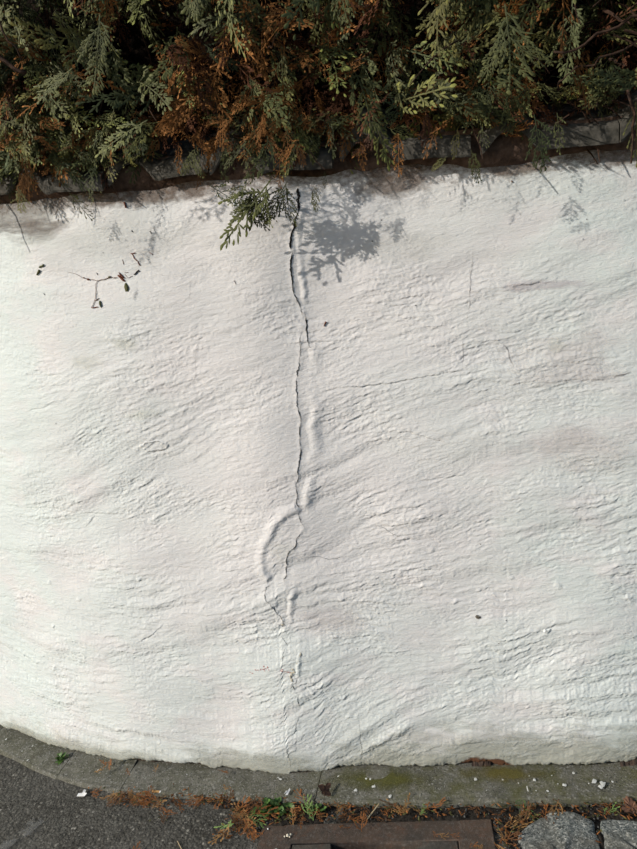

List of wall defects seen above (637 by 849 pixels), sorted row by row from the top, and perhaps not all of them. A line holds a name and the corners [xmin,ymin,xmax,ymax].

crack [264,188,311,666]